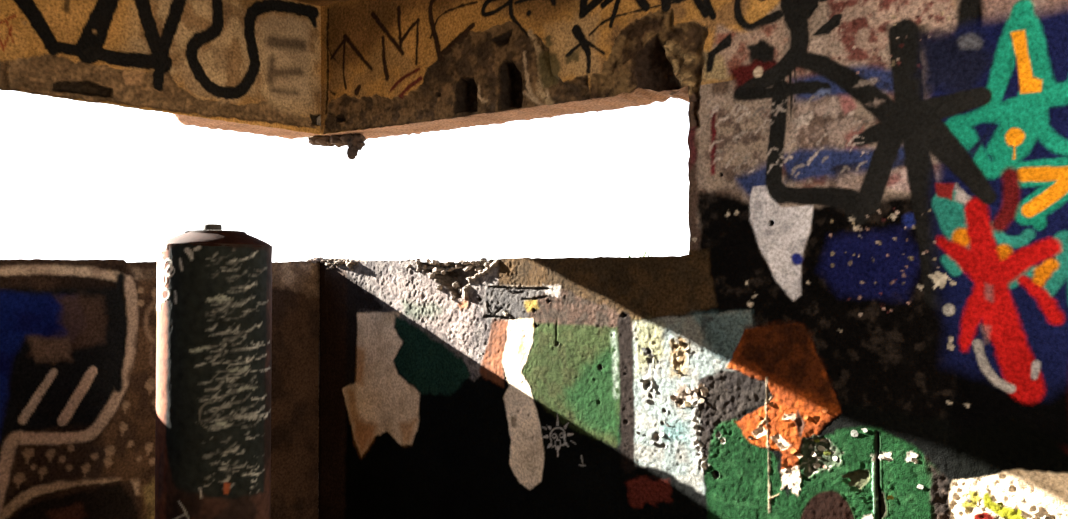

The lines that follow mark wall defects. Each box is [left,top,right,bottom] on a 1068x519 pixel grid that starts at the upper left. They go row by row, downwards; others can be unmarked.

spalling [296,257,360,271]
spalling [406,258,499,310]
peeling [636,335,710,473]
peeling [726,320,893,519]
peeling [906,450,919,463]